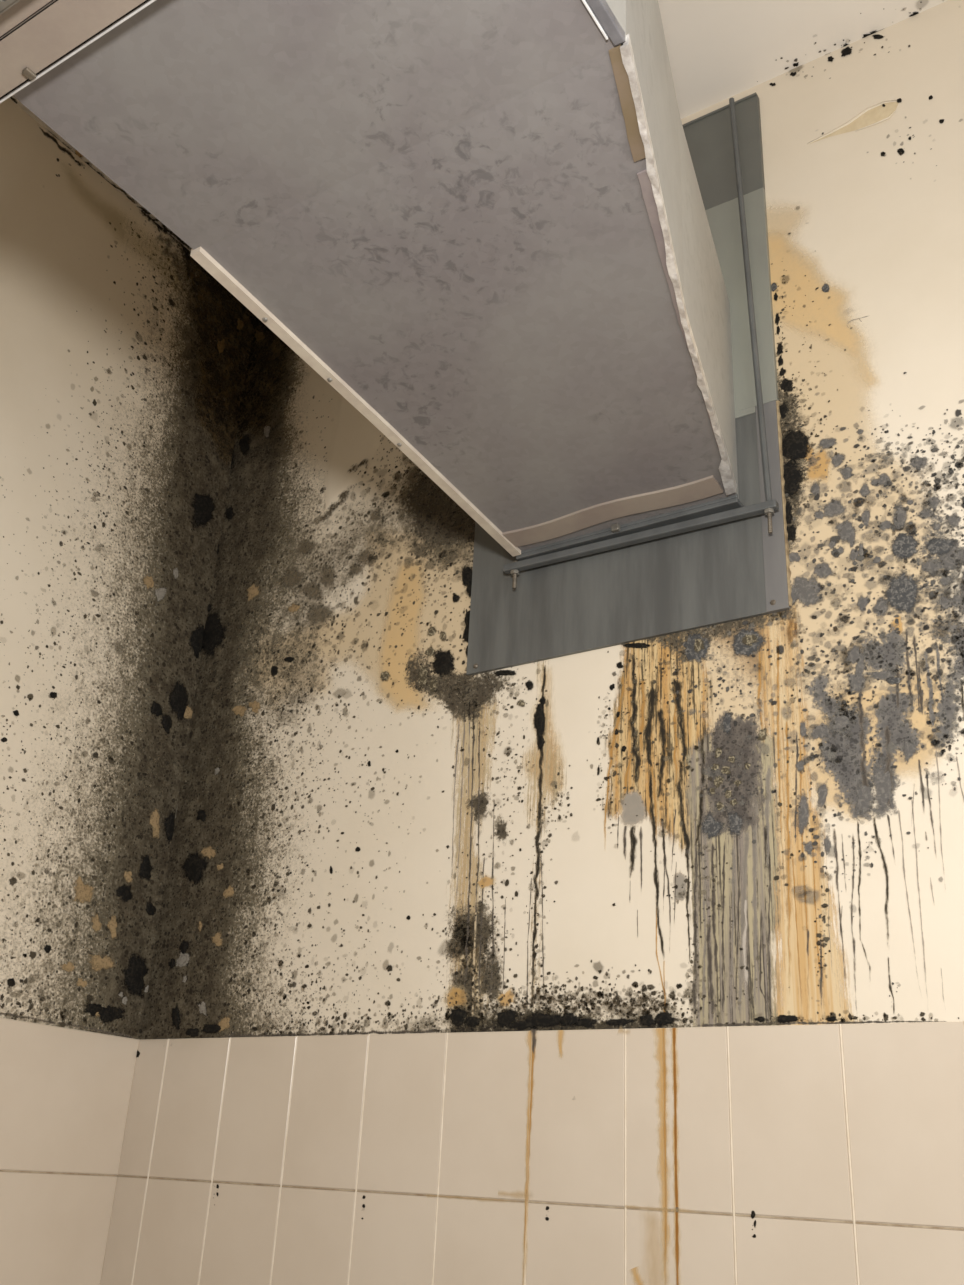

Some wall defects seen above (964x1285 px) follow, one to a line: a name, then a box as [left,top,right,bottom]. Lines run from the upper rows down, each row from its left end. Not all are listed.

damp [0,128,964,1040]
rust [524,1029,536,1266]
rust [656,1028,679,1285]